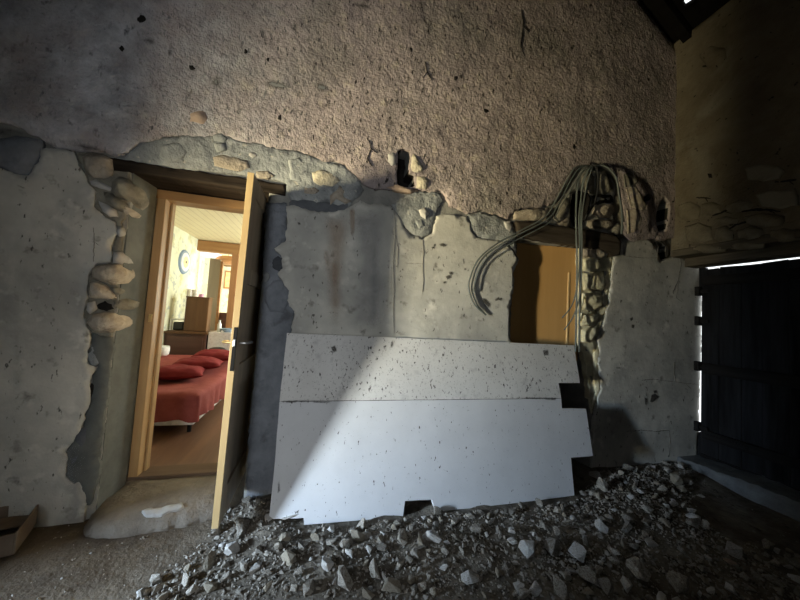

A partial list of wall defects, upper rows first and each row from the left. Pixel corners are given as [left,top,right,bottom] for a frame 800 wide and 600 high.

crack [520,9,529,56]
spalling [387,150,429,194]
spalling [552,164,624,240]
spalling [117,133,364,499]